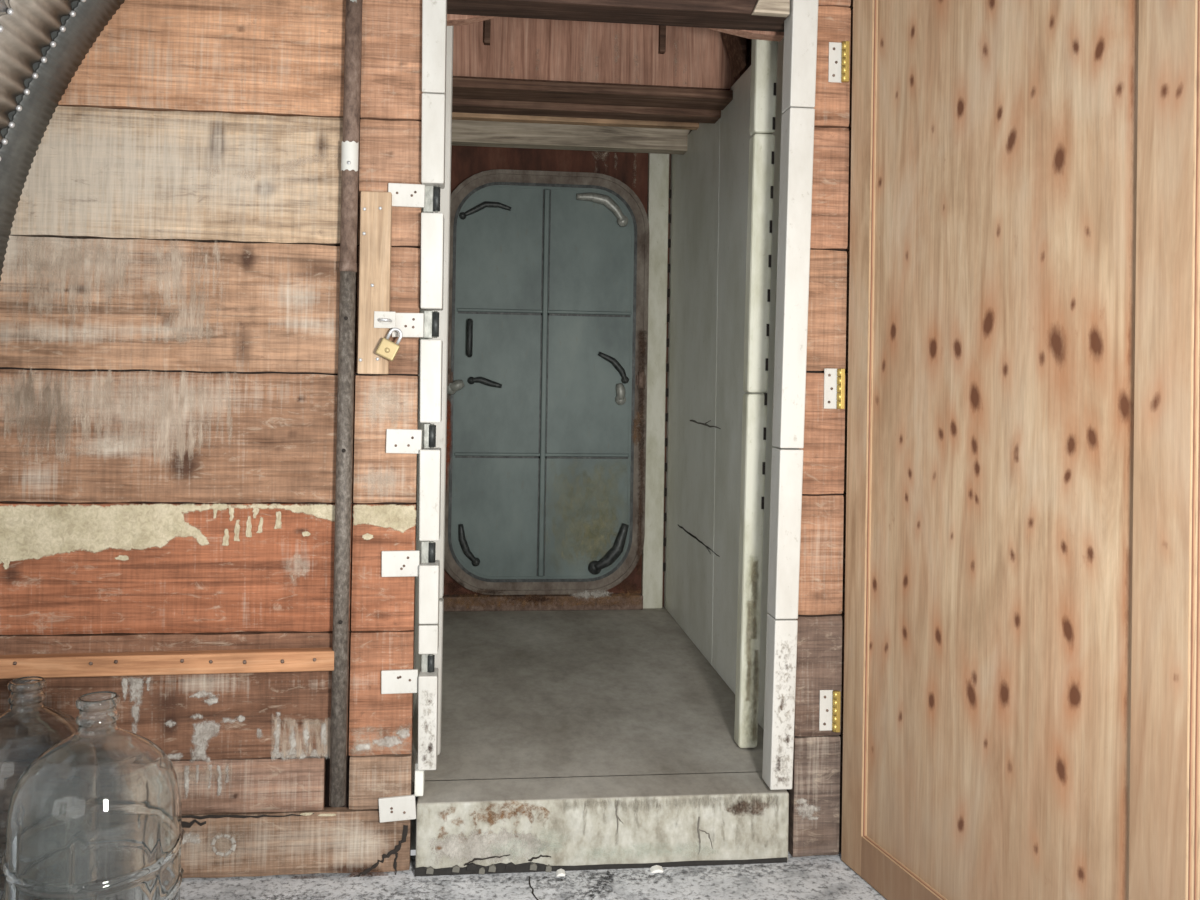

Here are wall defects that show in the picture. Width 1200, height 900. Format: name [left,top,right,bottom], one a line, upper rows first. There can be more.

peeling [0,503,335,569]
peeling [353,504,416,540]
crack [354,825,408,877]
spalling [414,854,787,877]